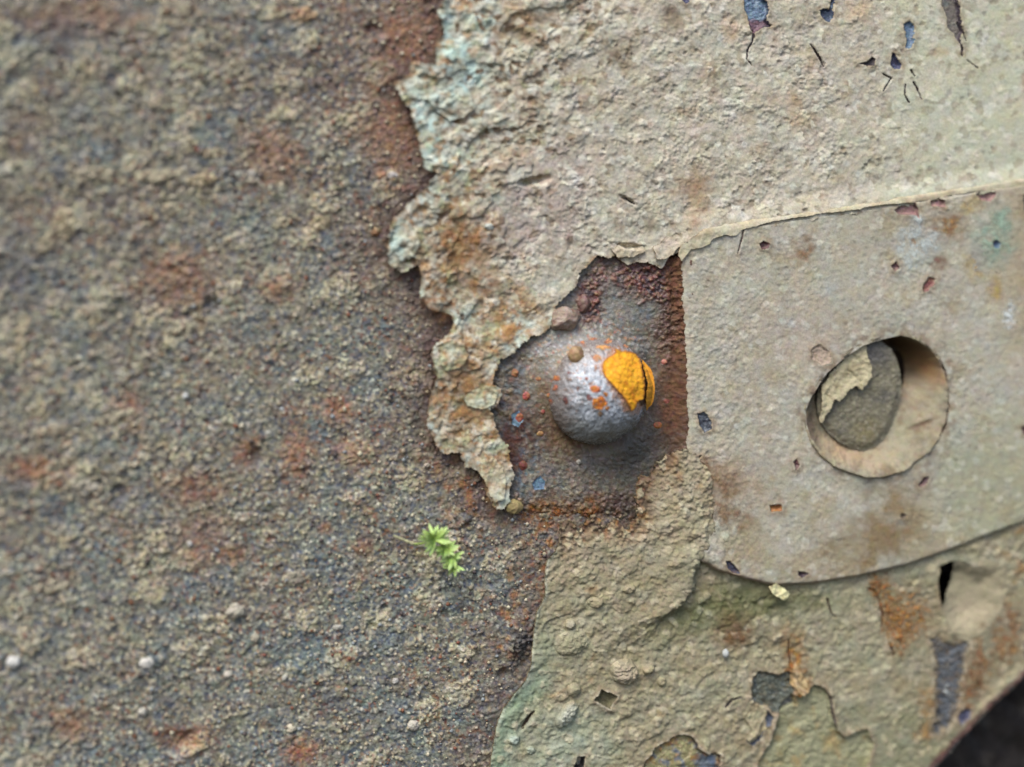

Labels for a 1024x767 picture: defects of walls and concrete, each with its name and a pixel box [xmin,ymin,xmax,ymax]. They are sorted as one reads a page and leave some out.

corrosion [551,294,591,331]
corrosion [580,338,632,361]
corrosion [639,255,687,434]
corrosion [536,372,571,415]
corrosion [577,377,609,417]
peeling [386,0,1024,767]
corrosion [504,392,544,470]